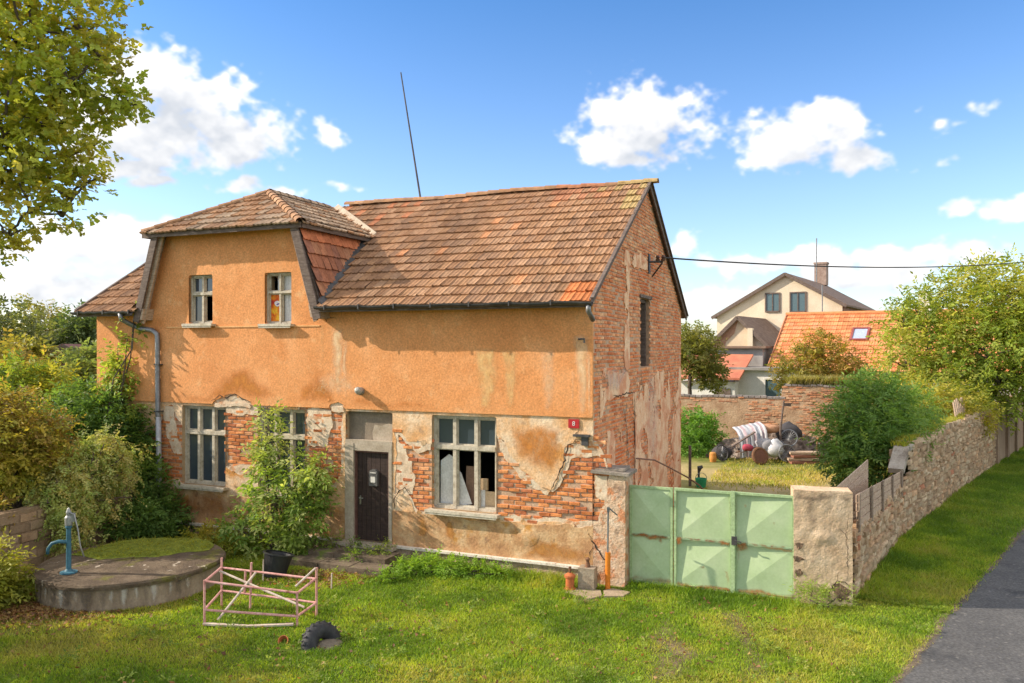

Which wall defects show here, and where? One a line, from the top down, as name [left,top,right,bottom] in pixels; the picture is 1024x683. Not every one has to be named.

flaking render [485,250,681,528]
flaking render [138,405,182,483]
flaking render [213,394,266,475]
flaking render [298,398,347,491]
flaking render [392,429,435,517]
water stain [517,430,556,462]
crack [542,432,581,490]